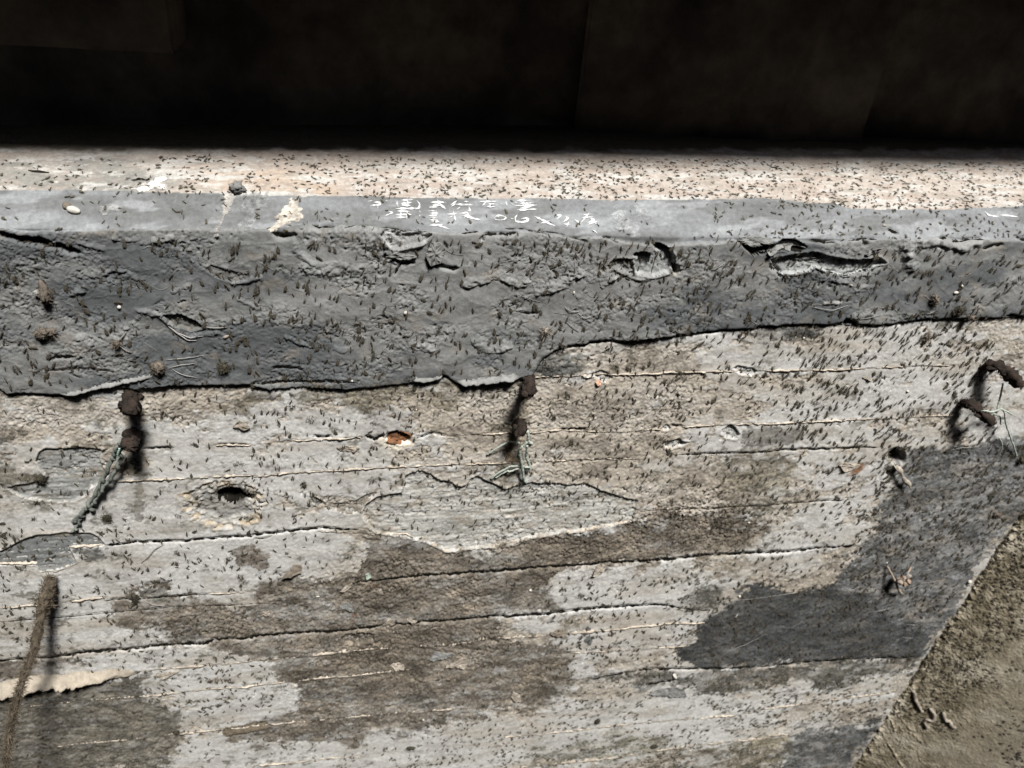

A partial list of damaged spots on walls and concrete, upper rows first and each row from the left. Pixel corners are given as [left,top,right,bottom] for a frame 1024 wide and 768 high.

spalling [0,231,80,253]
peeling [380,229,445,266]
peeling [609,243,675,277]
peeling [738,236,887,276]
spalling [206,265,250,282]
spalling [165,314,200,331]
spalling [521,375,538,399]
spalling [583,370,612,386]
spalling [733,366,757,377]
spalling [980,359,1024,390]
damp [111,425,1024,768]